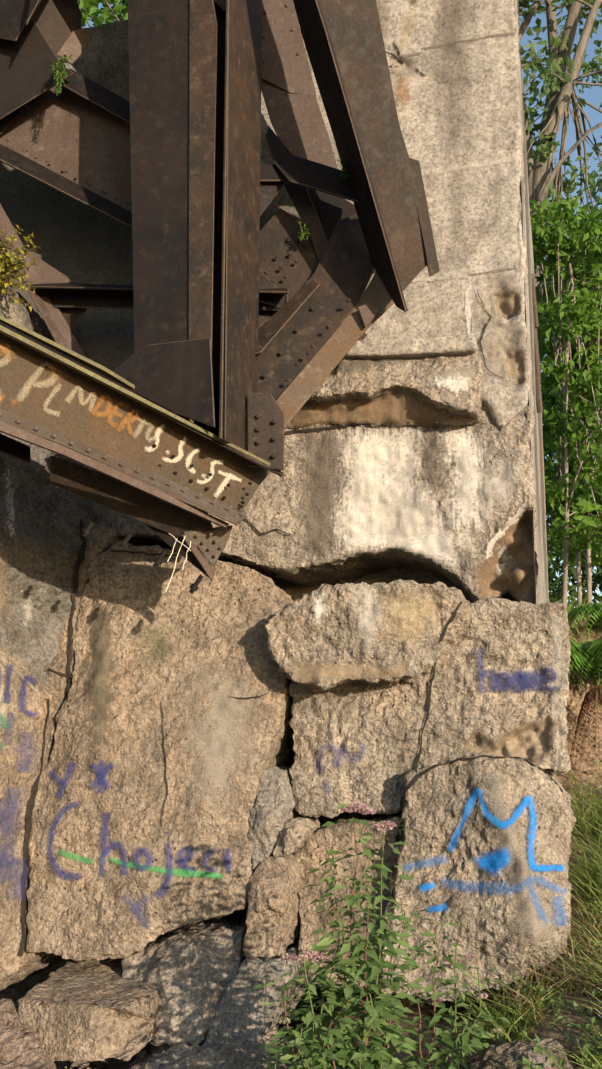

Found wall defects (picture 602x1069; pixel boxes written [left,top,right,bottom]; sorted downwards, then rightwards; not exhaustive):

spalling [438,271,528,397]
spalling [285,389,471,434]
leakage [308,426,515,570]
spalling [474,503,537,604]
crack [18,519,180,956]
crack [391,601,563,916]